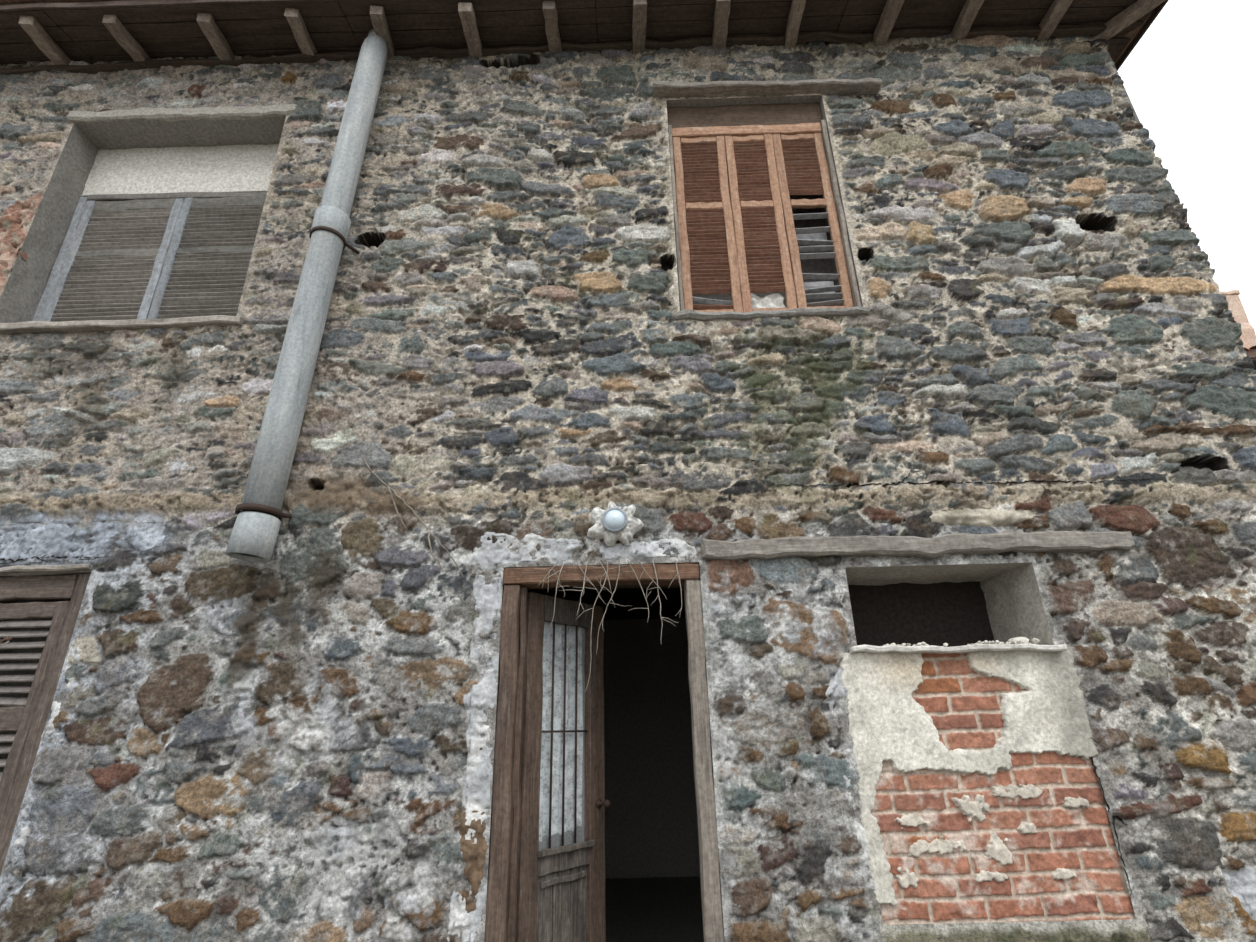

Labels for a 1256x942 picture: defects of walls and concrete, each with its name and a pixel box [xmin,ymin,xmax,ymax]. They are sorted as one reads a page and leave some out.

peeling [708,581,754,618]
peeling [720,639,749,677]
peeling [715,737,735,799]
flaking render [764,595,1099,906]